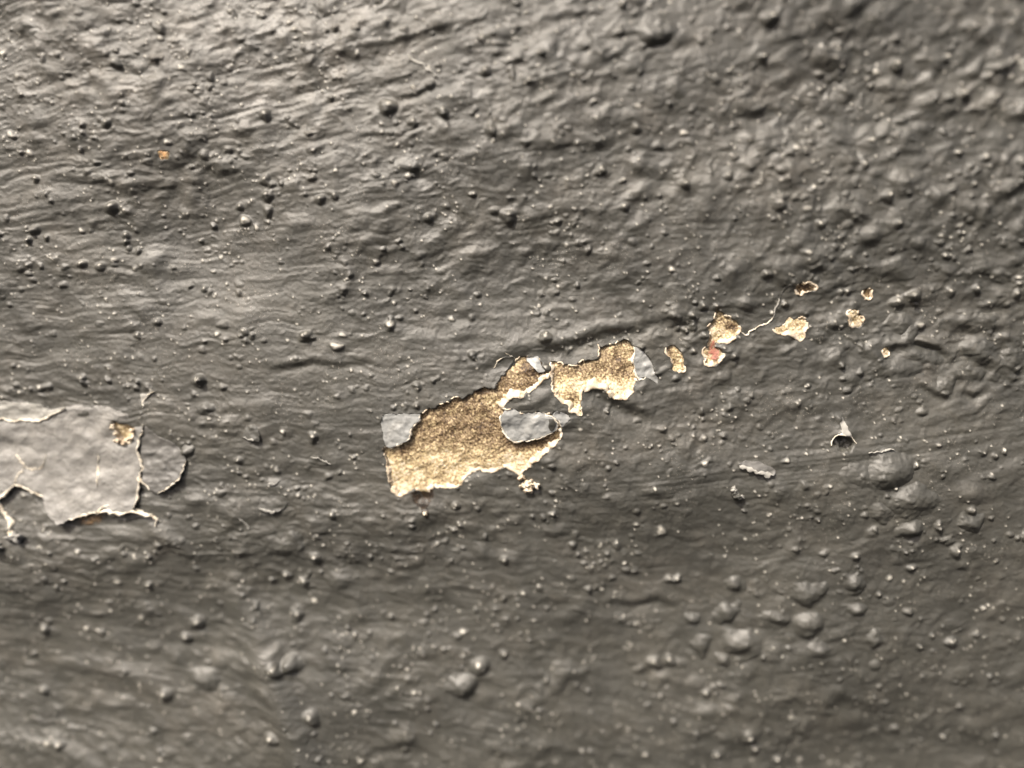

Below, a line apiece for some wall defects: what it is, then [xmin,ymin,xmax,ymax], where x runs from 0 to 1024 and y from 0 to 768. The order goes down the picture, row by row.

peeling [794,281,818,296]
peeling [846,288,873,328]
peeling [664,346,686,373]
peeling [702,311,741,368]
peeling [772,316,809,342]
peeling [381,339,658,497]
peeling [0,401,187,549]